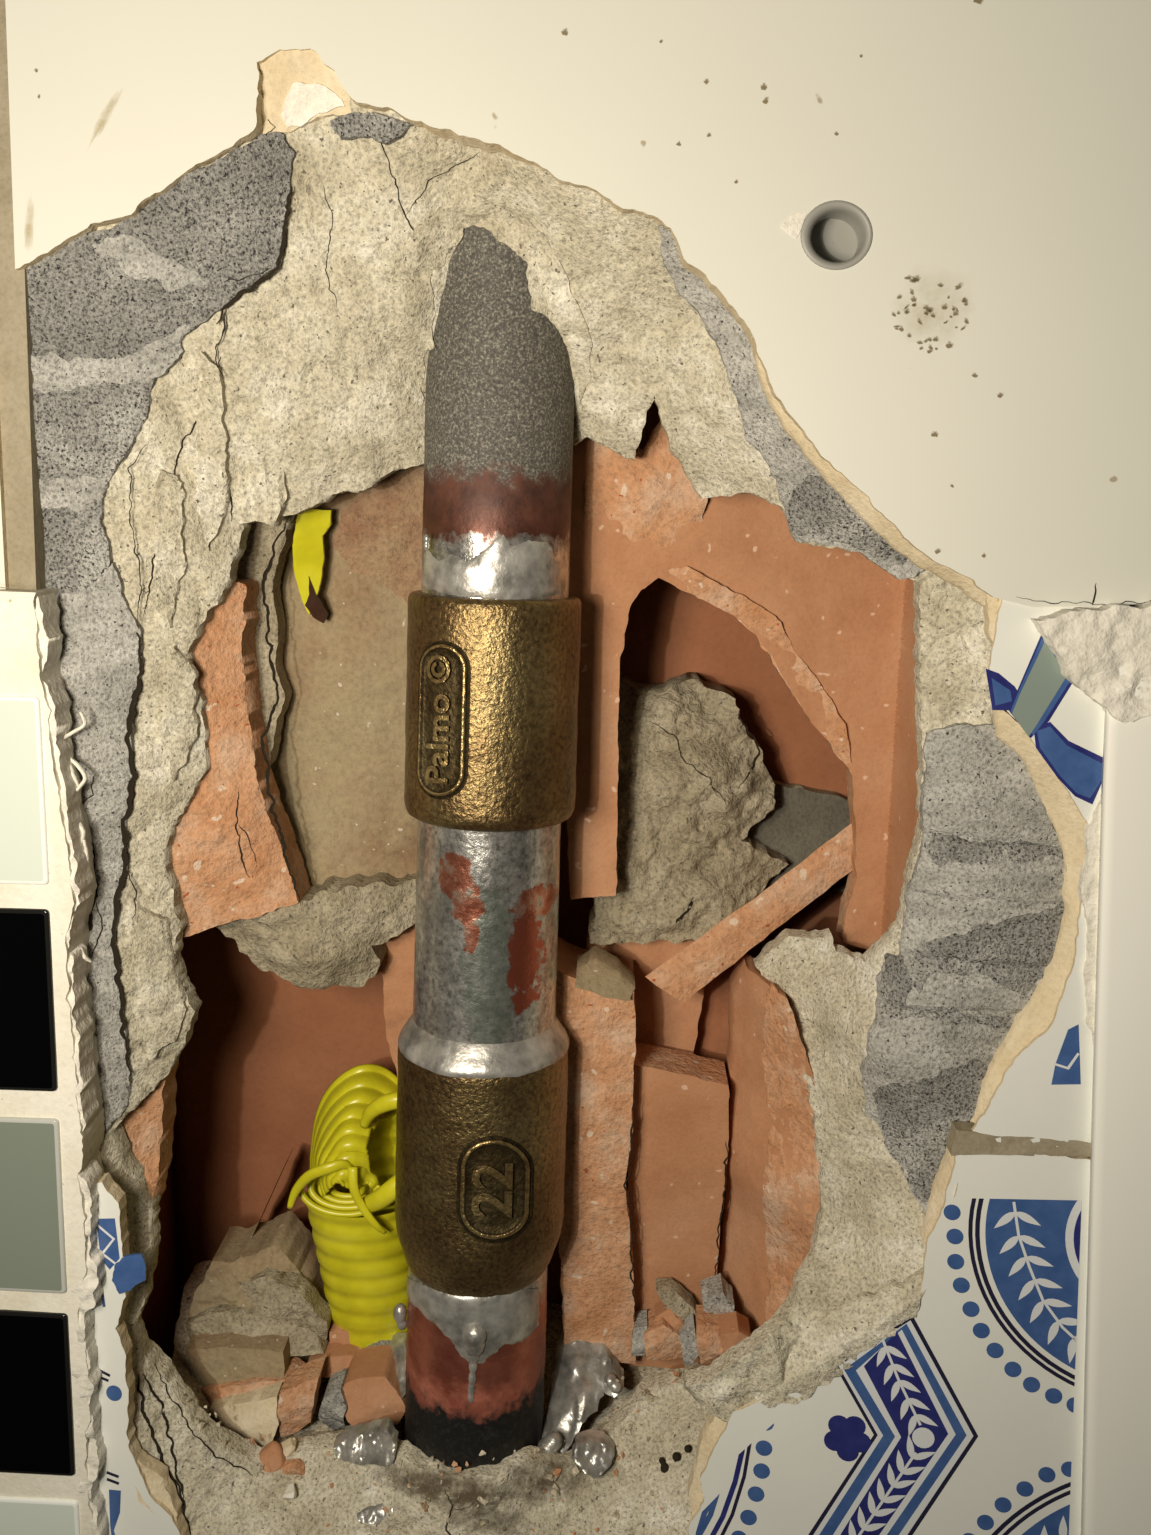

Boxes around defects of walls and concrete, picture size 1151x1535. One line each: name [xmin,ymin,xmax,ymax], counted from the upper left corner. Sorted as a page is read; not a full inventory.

spalling [259,50,351,134]
spalling [26,112,1011,1535]
spalling [860,962,1041,1131]
spalling [897,722,1065,996]
spalling [947,599,1105,1157]
spalling [688,1146,1090,1535]